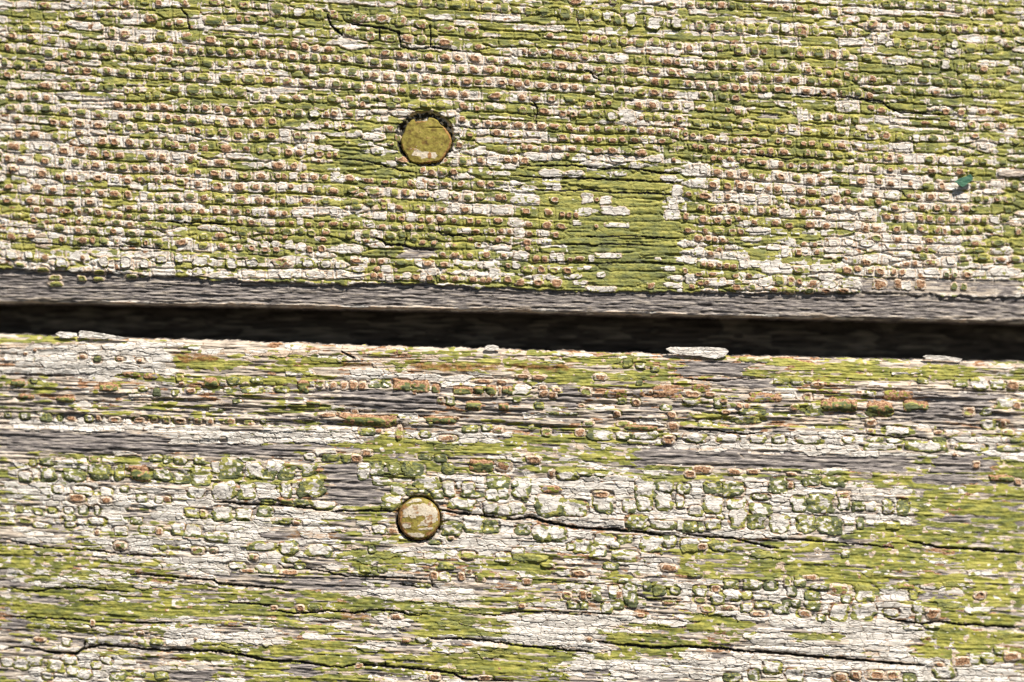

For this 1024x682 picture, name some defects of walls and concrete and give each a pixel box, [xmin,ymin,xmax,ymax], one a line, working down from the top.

peeling [954,174,973,187]
peeling [397,247,436,259]
peeling [859,278,1023,296]
peeling [0,331,225,400]
peeling [0,343,1024,682]
crack [440,509,1020,554]
crack [4,539,509,682]